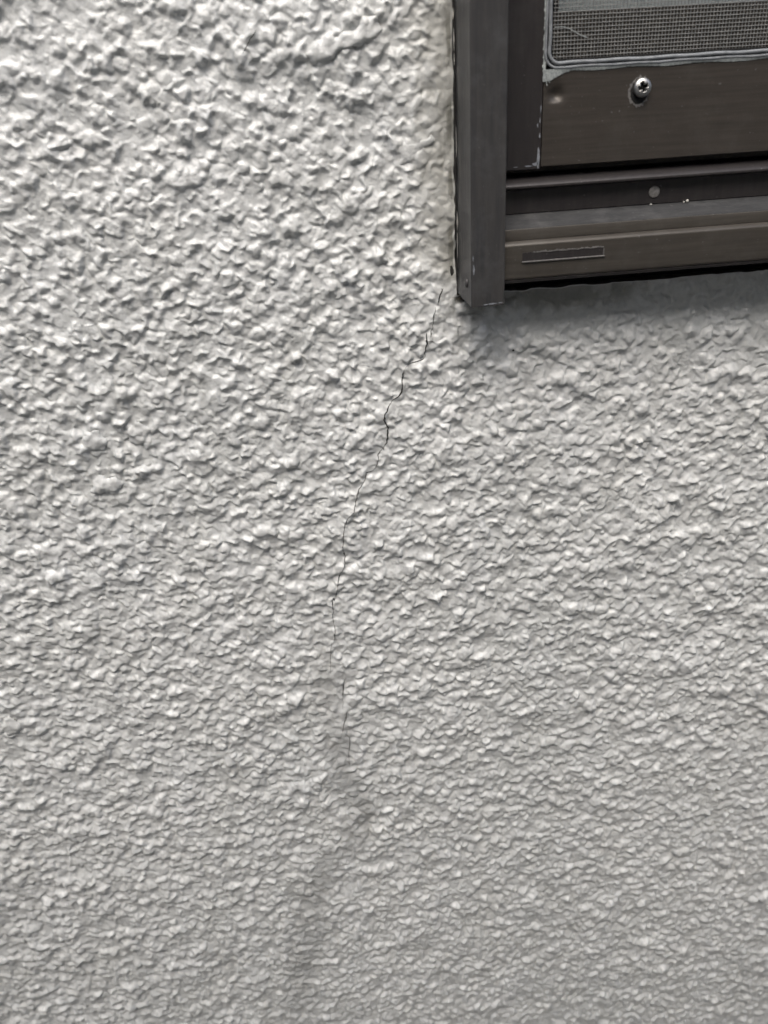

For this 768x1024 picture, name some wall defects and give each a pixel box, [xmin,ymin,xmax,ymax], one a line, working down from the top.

crack [330,0,458,765]